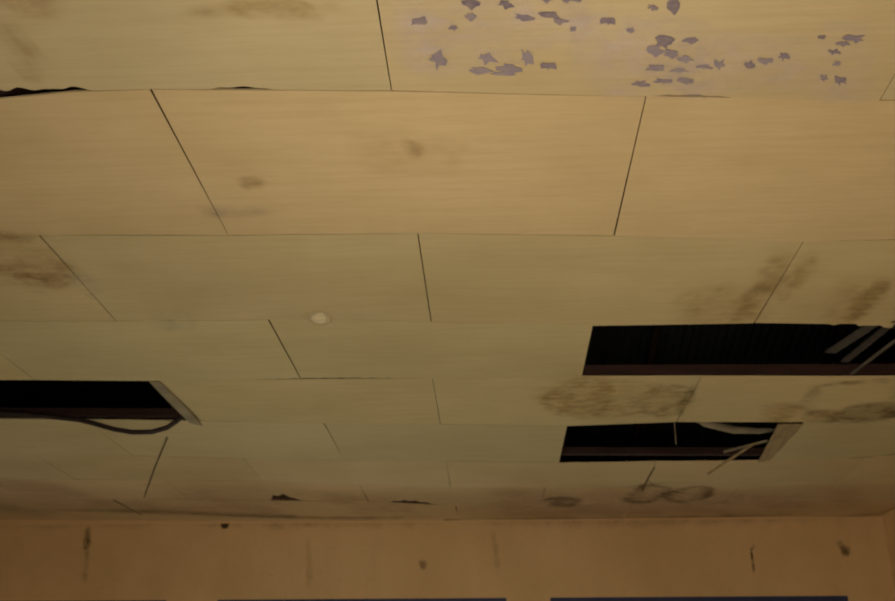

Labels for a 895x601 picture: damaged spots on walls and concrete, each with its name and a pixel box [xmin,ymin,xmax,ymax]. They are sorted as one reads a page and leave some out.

peeling [411,16,427,26]
peeling [461,0,481,22]
peeling [498,0,576,32]
peeling [648,0,680,15]
peeling [429,50,448,70]
peeling [469,49,557,76]
peeling [632,35,725,87]
peeling [744,53,790,69]
peeling [820,35,865,86]